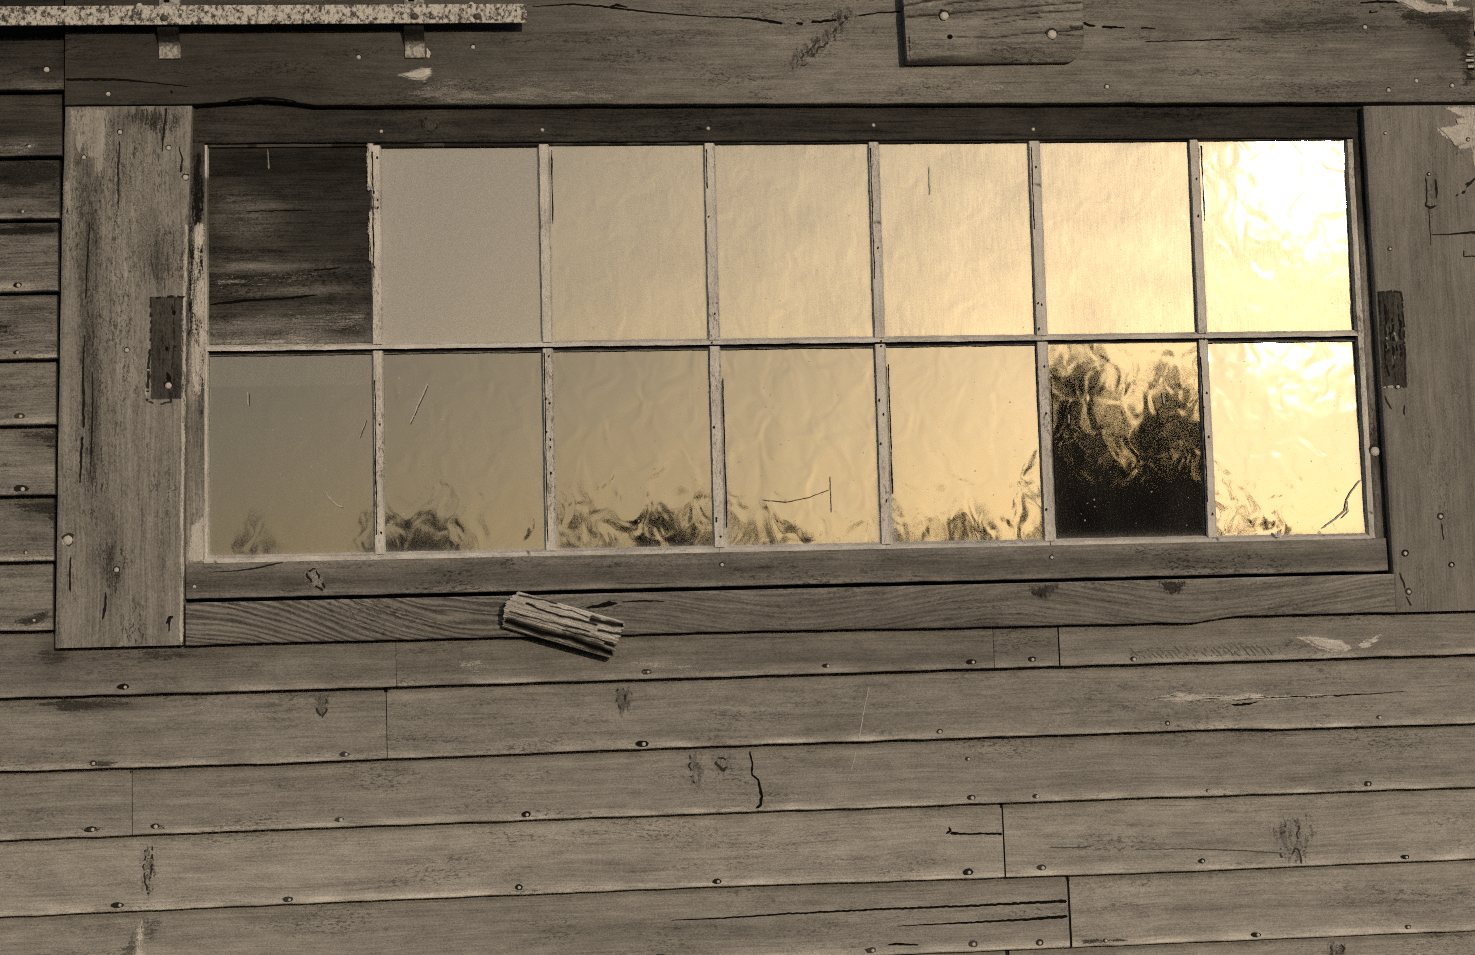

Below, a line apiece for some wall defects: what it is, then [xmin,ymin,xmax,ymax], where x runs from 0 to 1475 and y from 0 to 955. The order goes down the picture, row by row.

crack [532,3,901,25]
peeling [1395,0,1470,14]
peeling [1437,106,1475,166]
peeling [1296,634,1381,653]
crack [1232,691,1404,706]
crack [749,752,763,808]
peeling [135,919,145,955]
crack [672,899,1068,946]